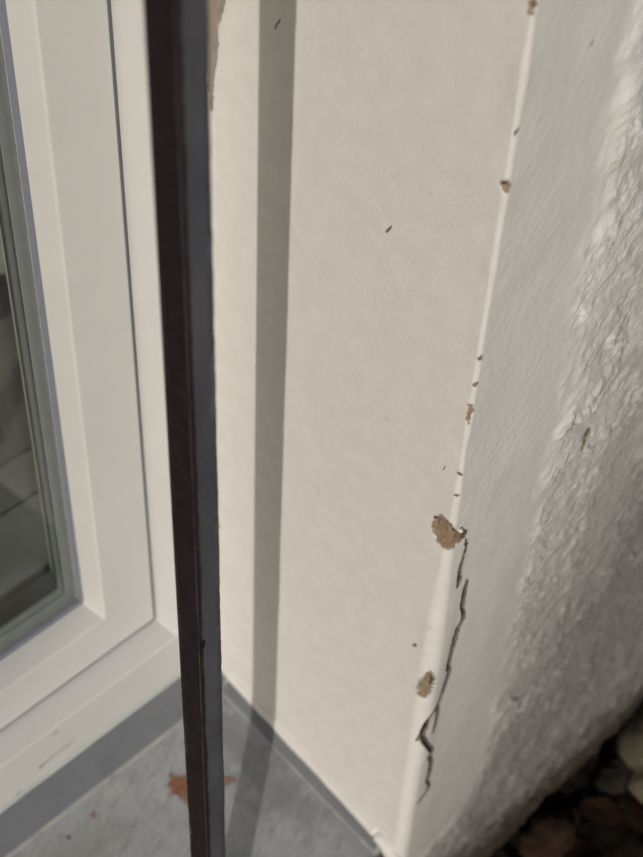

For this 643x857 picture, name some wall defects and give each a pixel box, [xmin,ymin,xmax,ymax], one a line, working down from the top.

flaking render [208,0,225,110]
spalling [432,514,467,550]
spalling [417,671,436,698]
crack [416,539,468,804]